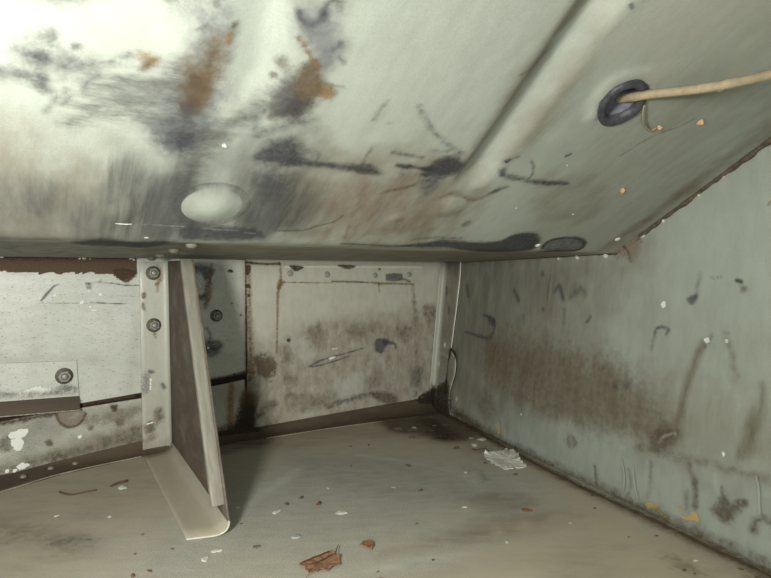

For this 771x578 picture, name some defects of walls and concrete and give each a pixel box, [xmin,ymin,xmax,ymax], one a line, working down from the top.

corrosion [158,39,221,139]
corrosion [270,51,331,117]
corrosion [210,260,303,431]
corrosion [80,394,135,411]
peeling [0,429,29,451]